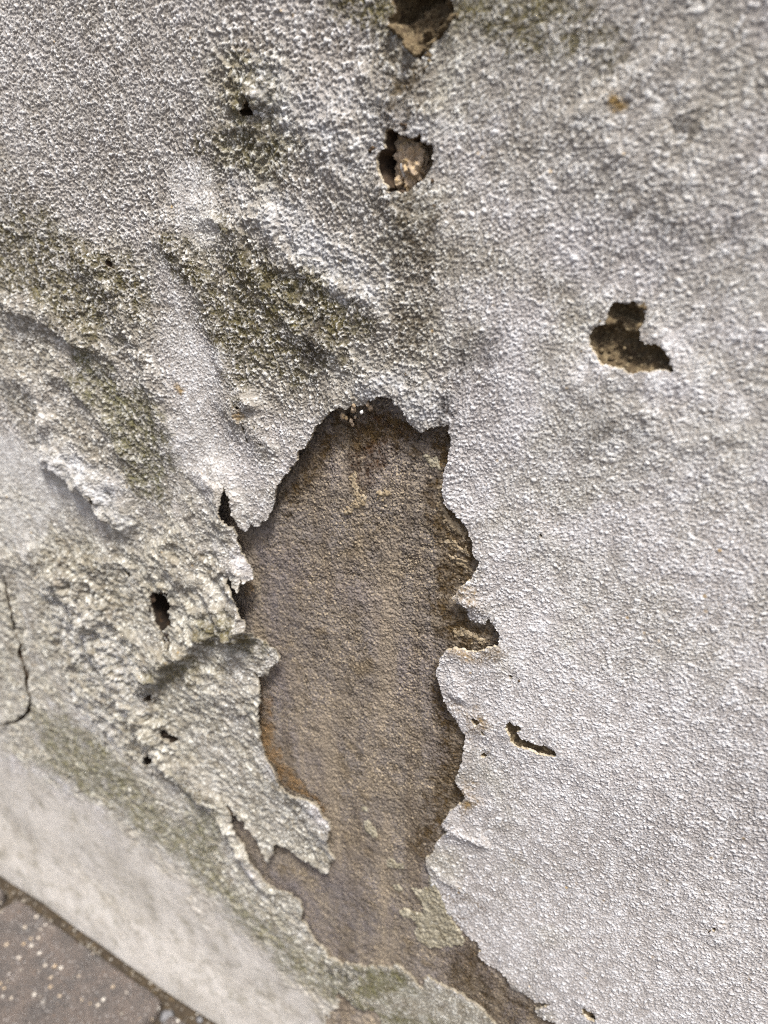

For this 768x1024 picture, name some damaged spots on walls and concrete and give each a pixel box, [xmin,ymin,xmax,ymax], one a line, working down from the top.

spalling [379,0,461,68]
spalling [368,123,434,199]
spalling [580,292,683,374]
crack [0,571,32,726]
peeling [209,396,556,1024]